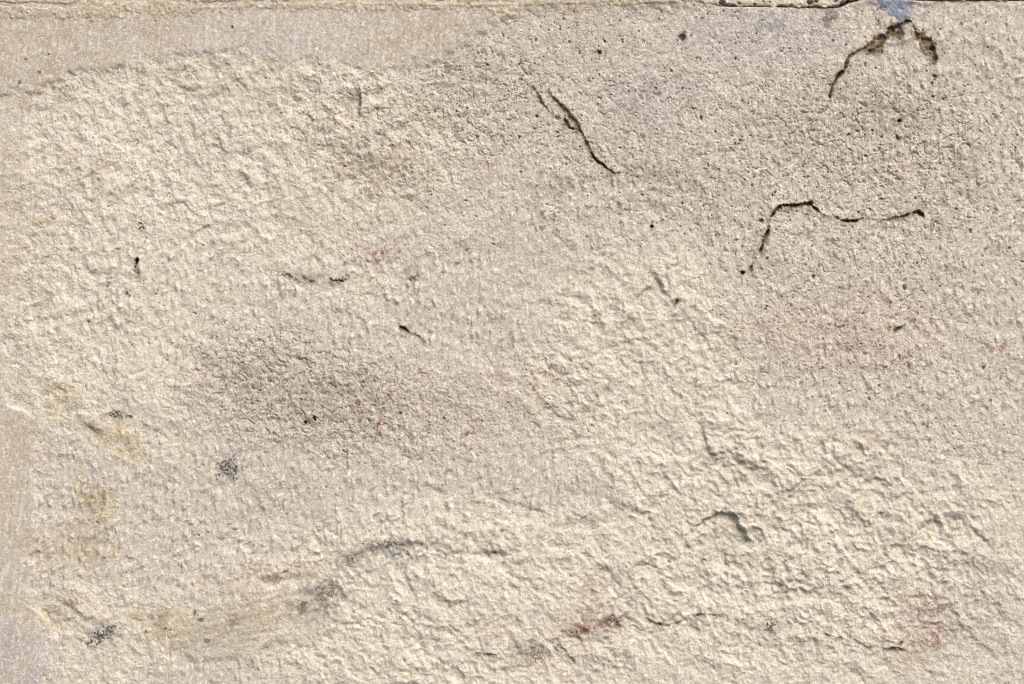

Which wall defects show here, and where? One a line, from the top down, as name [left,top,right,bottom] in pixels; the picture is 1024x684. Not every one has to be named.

crack [828,17,938,98]
crack [531,86,607,169]
crack [749,200,858,270]
crack [892,209,924,219]